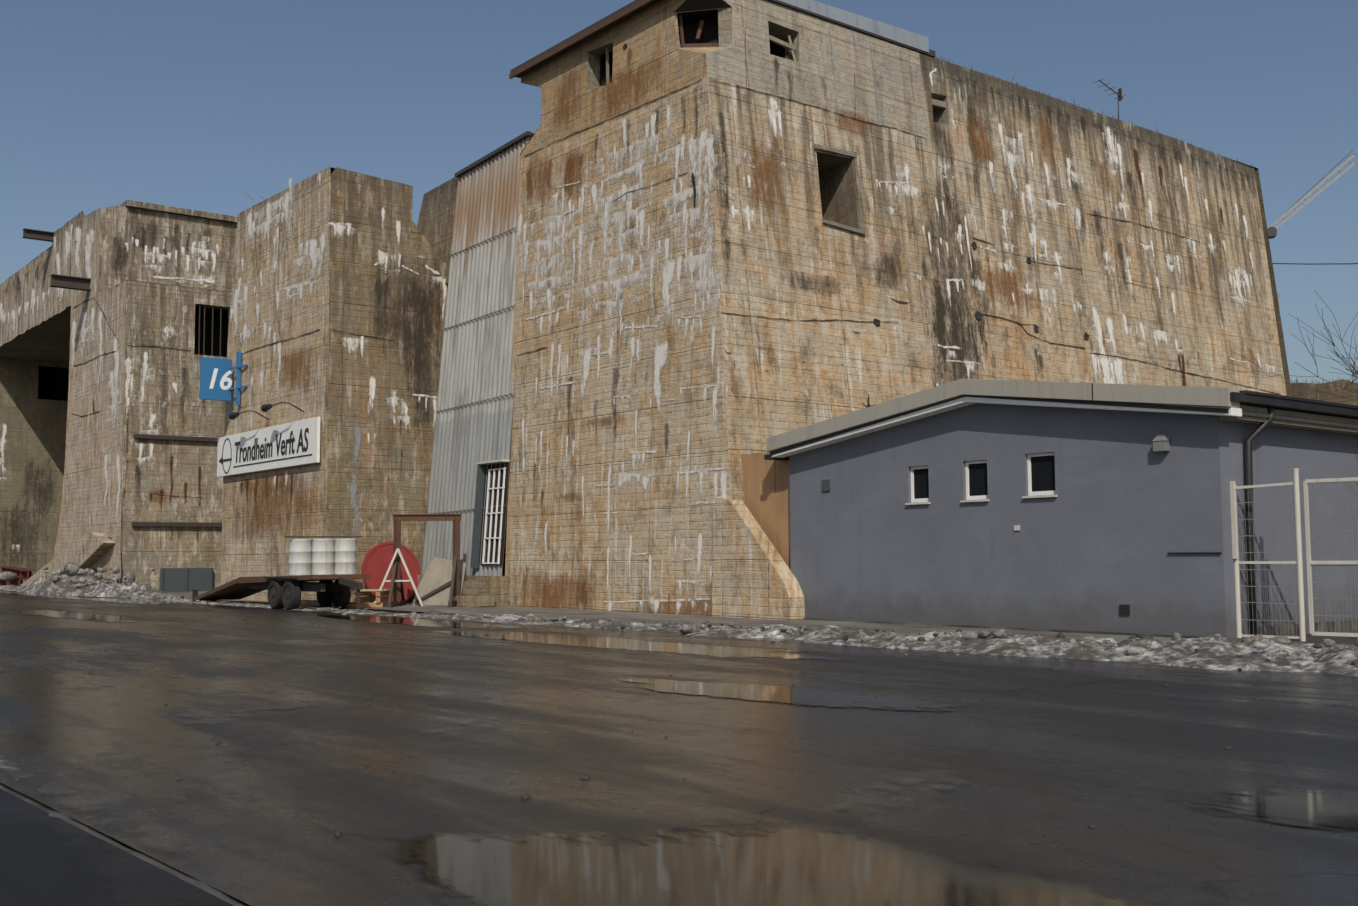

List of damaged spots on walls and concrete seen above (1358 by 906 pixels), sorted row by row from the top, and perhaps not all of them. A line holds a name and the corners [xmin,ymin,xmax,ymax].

damp [0,225,160,526]
damp [114,179,356,394]
damp [343,336,367,357]
damp [368,208,447,429]
damp [516,98,755,613]
damp [876,163,921,215]
rust [987,272,1028,307]
damp [917,77,1253,386]
damp [2,463,53,565]
rust [240,472,315,535]
damp [349,426,375,539]